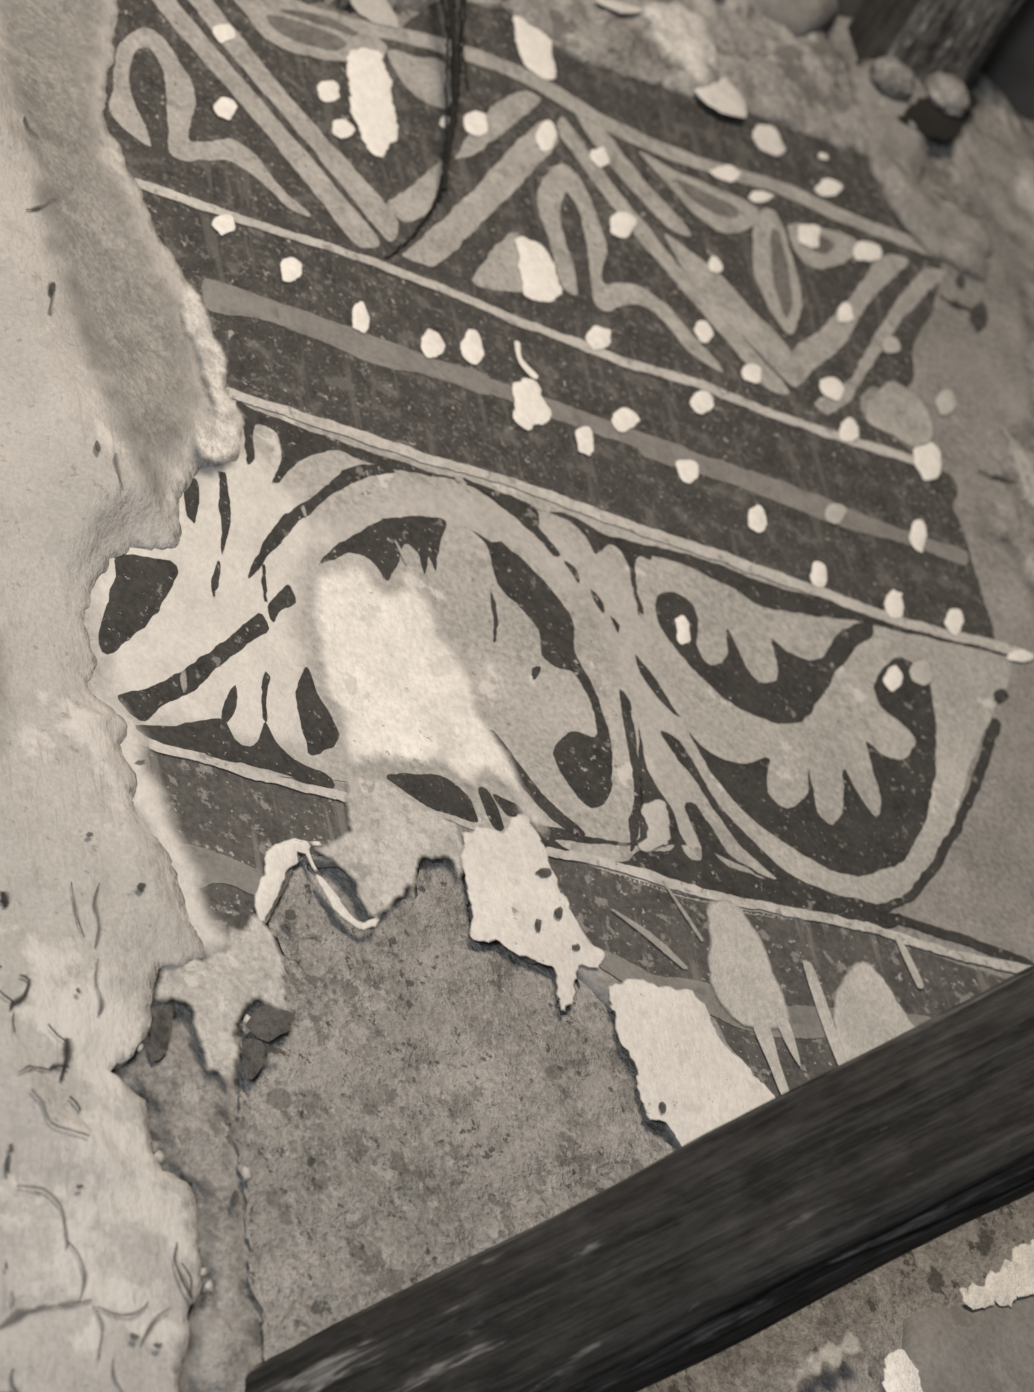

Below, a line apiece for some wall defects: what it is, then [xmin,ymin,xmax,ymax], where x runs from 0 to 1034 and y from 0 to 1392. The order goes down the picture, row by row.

spalling [130,563,801,1392]
peeling [803,960,914,1066]
peeling [895,937,924,989]